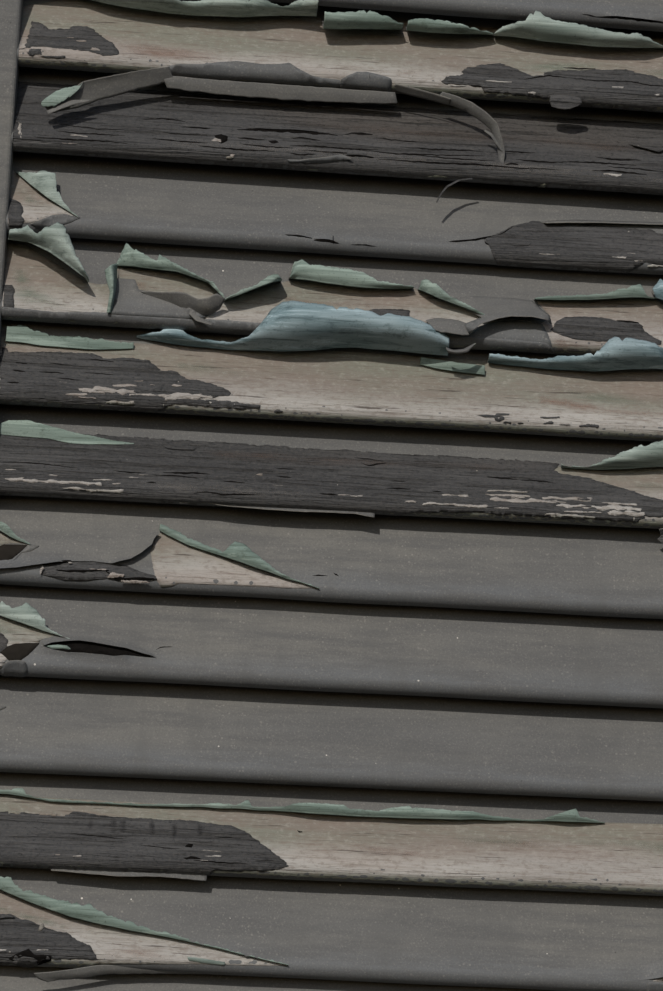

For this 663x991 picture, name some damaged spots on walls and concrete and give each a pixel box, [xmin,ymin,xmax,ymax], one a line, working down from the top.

peeling [12,0,663,203]
peeling [0,171,663,544]
peeling [0,601,158,677]
peeling [0,522,319,589]
peeling [0,788,663,991]